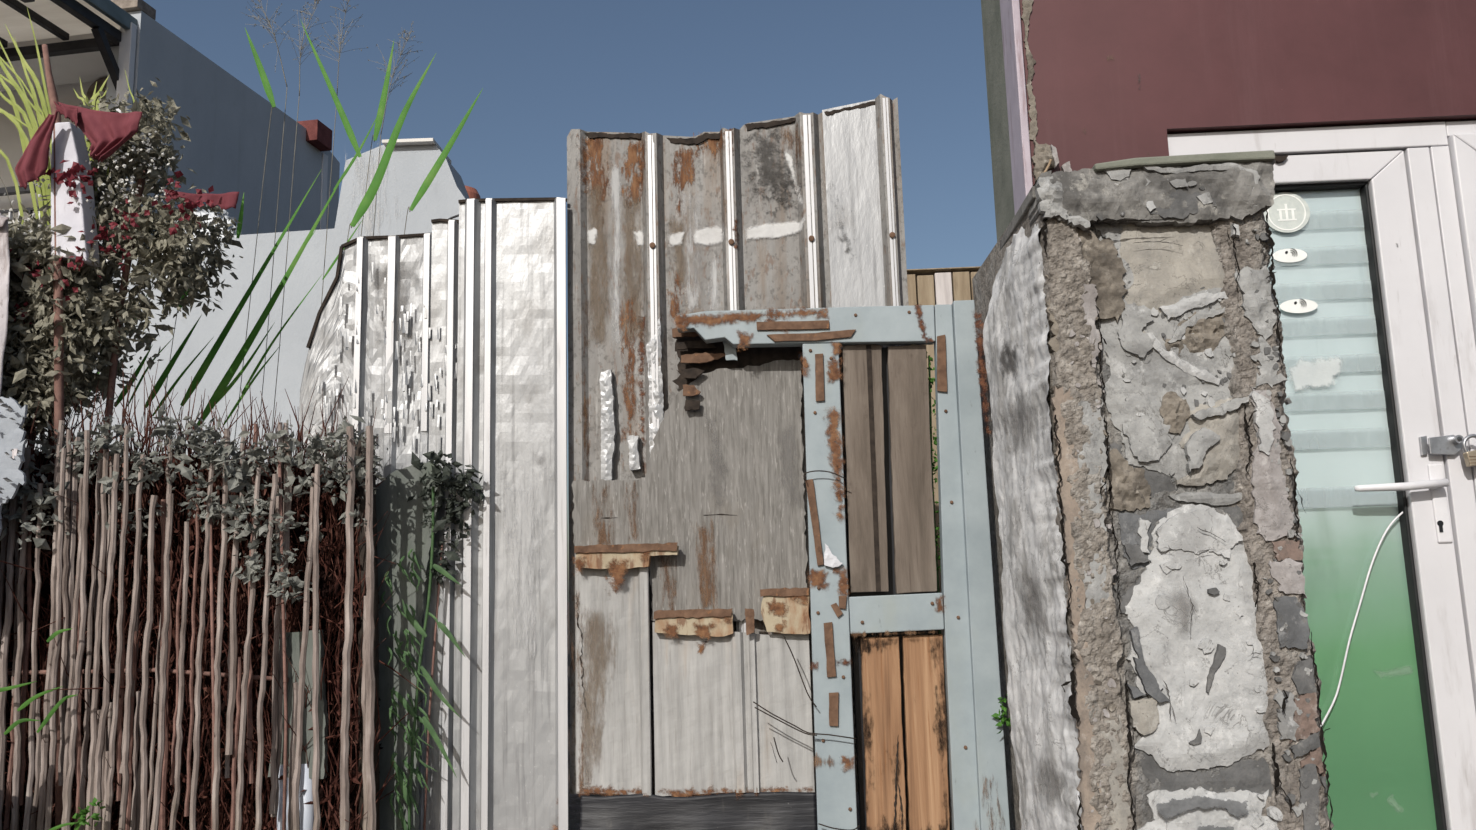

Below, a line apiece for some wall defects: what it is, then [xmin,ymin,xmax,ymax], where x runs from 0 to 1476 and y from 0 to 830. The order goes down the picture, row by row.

rust [670,129,828,350]
rust [571,597,642,796]
rust [577,135,731,654]
rust [660,787,813,799]
rust [768,567,849,632]
rust [823,409,845,519]
rust [814,754,854,772]
crack [1053,415,1072,611]
crack [1061,663,1080,727]
crack [1075,796,1083,830]
crack [1096,306,1121,608]
peeling [1021,0,1328,830]